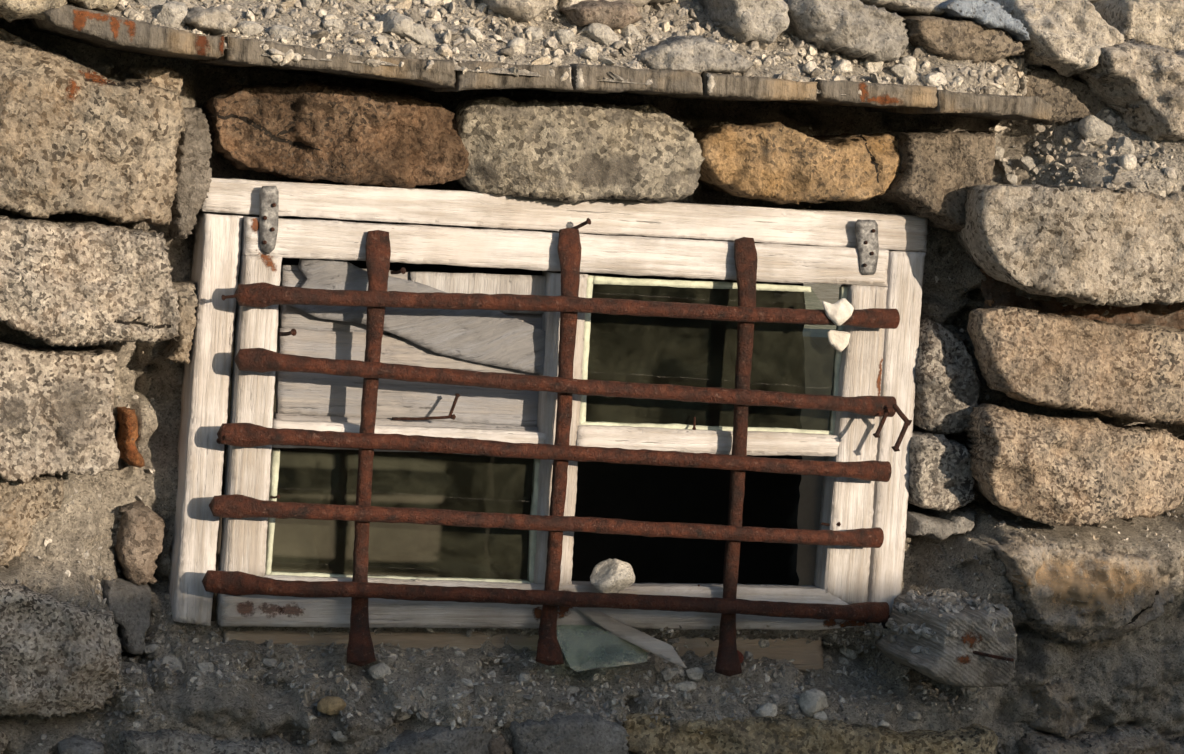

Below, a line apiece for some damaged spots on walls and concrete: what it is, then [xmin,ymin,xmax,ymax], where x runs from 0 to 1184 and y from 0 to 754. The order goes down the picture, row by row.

rust [73,9,136,38]
rust [195,34,225,57]
rust [256,250,276,271]
rust [237,601,303,618]